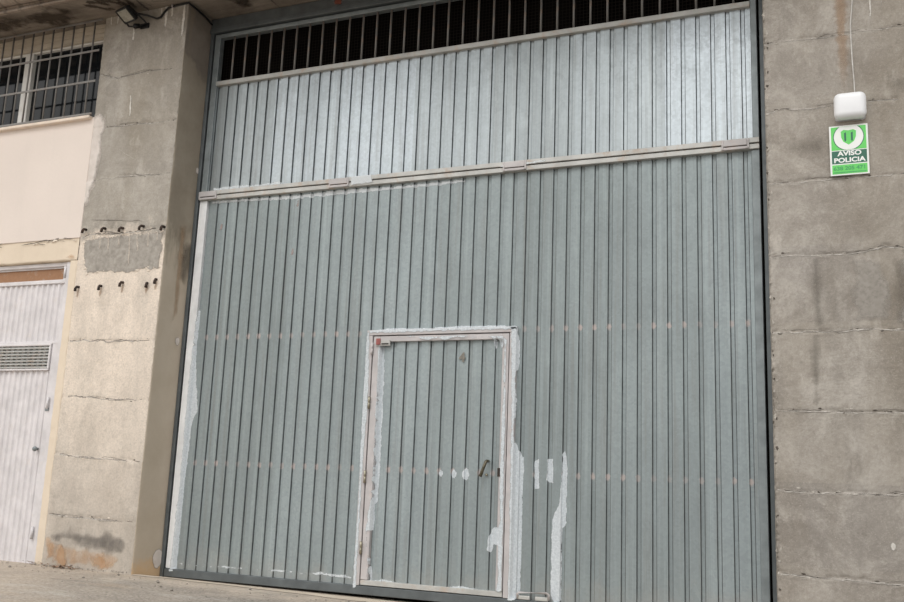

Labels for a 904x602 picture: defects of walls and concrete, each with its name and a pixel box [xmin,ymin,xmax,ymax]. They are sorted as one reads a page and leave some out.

damp [153,0,186,36]